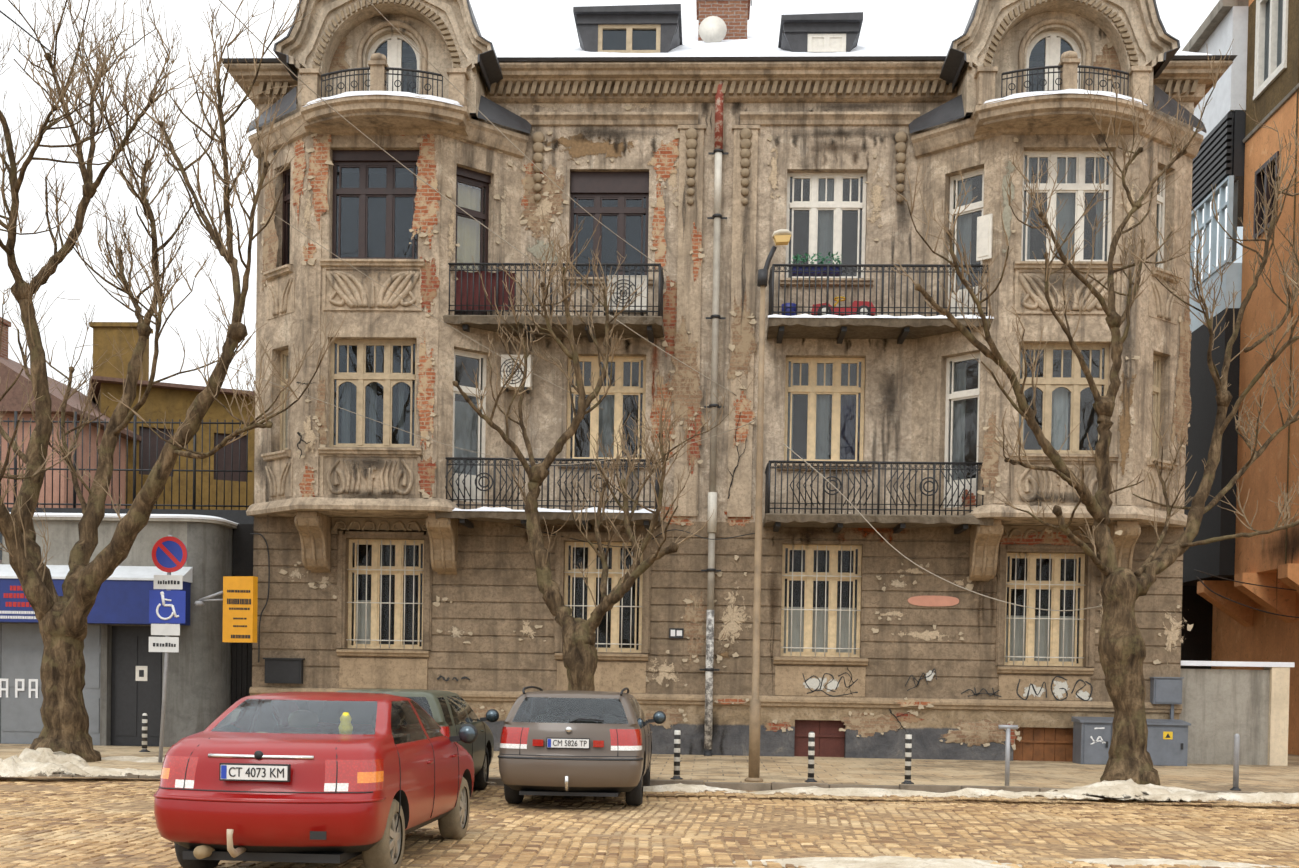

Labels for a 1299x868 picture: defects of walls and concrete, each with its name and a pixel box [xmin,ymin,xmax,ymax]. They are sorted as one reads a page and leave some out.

flaking render [293,133,334,266]
spalling [459,131,634,262]
flaking render [409,134,460,499]
spalling [648,132,706,474]
peeling [1153,605,1194,664]
spalling [839,697,937,738]
spalling [939,719,1022,750]